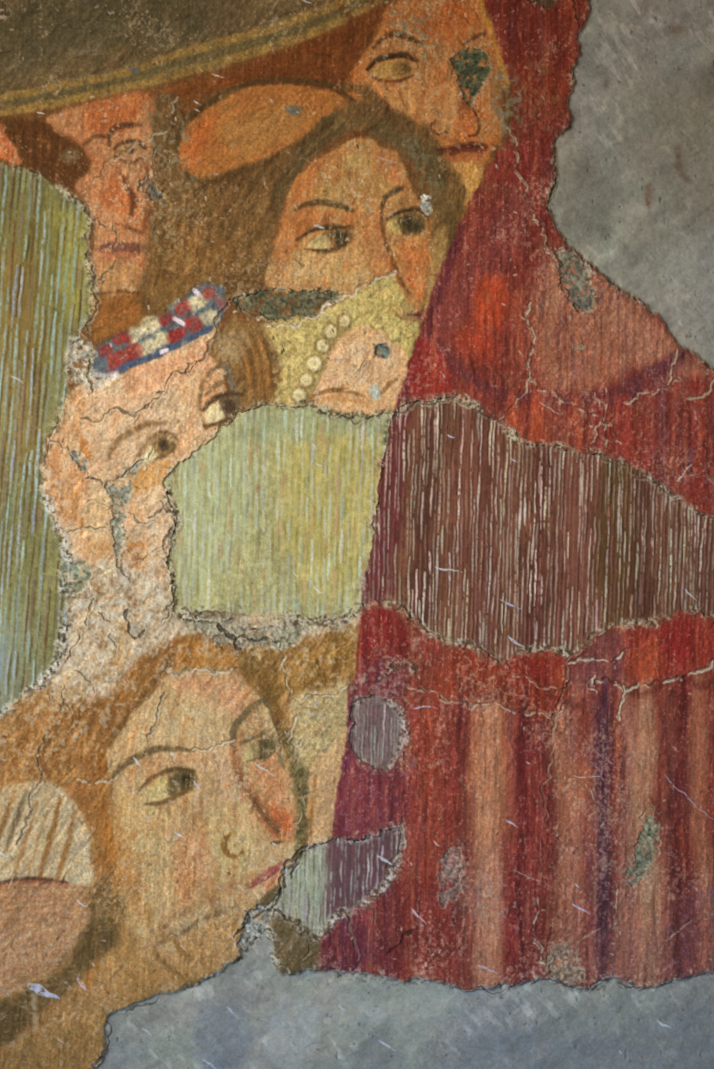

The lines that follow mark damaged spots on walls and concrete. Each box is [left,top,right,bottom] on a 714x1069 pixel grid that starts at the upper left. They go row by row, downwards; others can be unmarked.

spalling [450,47,493,106]
crack [94,97,177,200]
spalling [547,0,714,369]
crack [70,208,396,425]
crack [398,301,539,429]
crack [564,349,714,462]
crack [60,448,154,534]
crack [117,501,182,579]
spalling [182,611,304,653]
crack [406,632,714,823]
spalling [625,808,662,888]
spalling [97,911,714,1069]